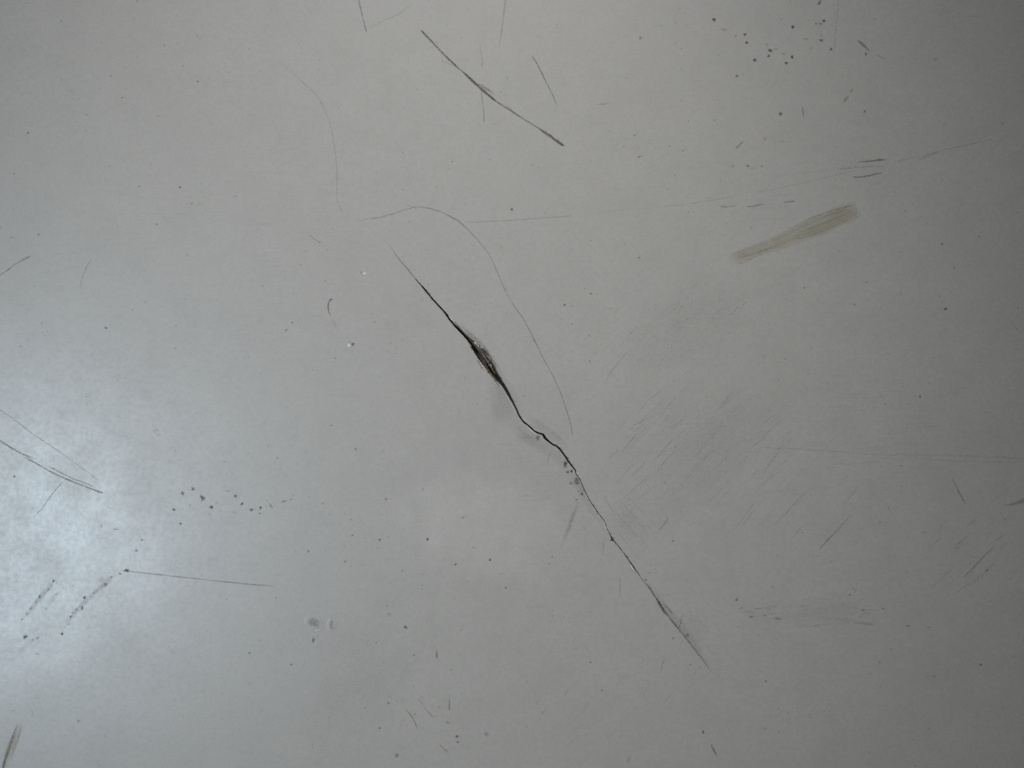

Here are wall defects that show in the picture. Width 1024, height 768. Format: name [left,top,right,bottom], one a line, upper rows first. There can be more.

crack [405,266,678,628]